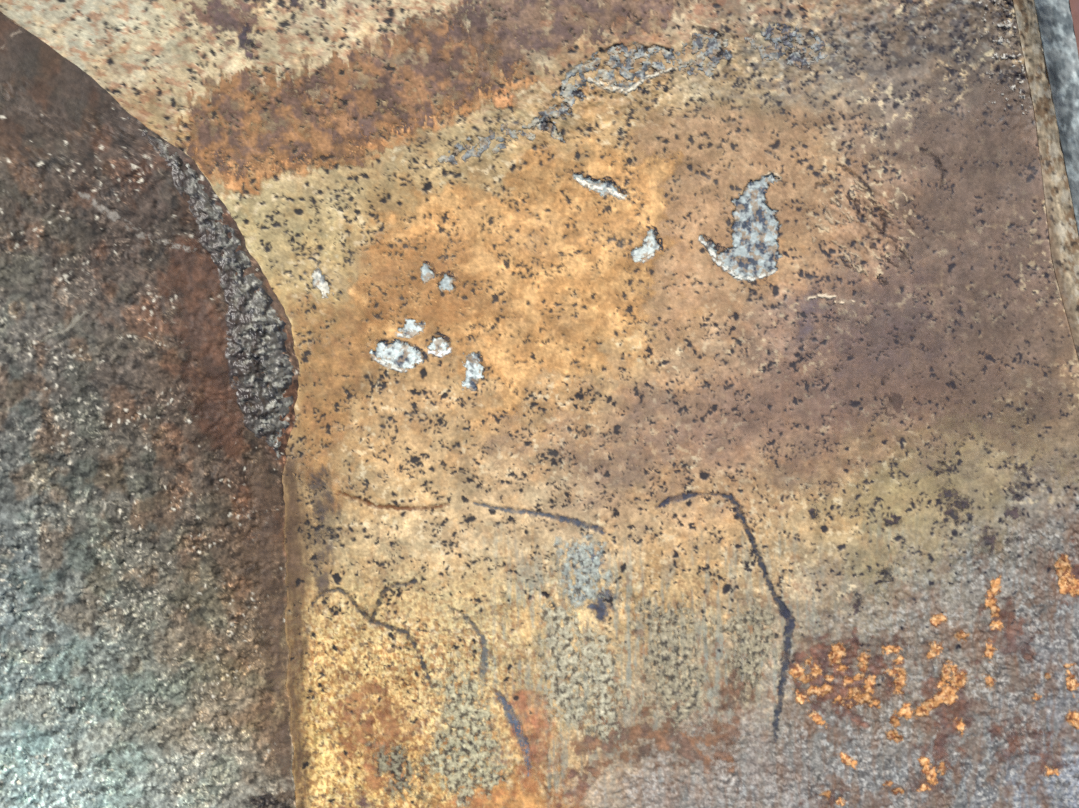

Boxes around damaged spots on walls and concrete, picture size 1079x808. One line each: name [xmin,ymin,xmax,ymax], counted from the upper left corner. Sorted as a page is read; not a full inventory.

peeling [437,32,732,164]
peeling [630,226,663,263]
peeling [699,172,783,283]
peeling [369,318,485,391]
crack [474,502,604,534]
crack [311,579,432,687]
crack [659,493,796,741]
corrosion [976,576,1032,663]
corrosion [1048,540,1079,605]
crack [452,608,532,776]
corrosion [789,628,996,795]
corrosion [990,719,1062,776]